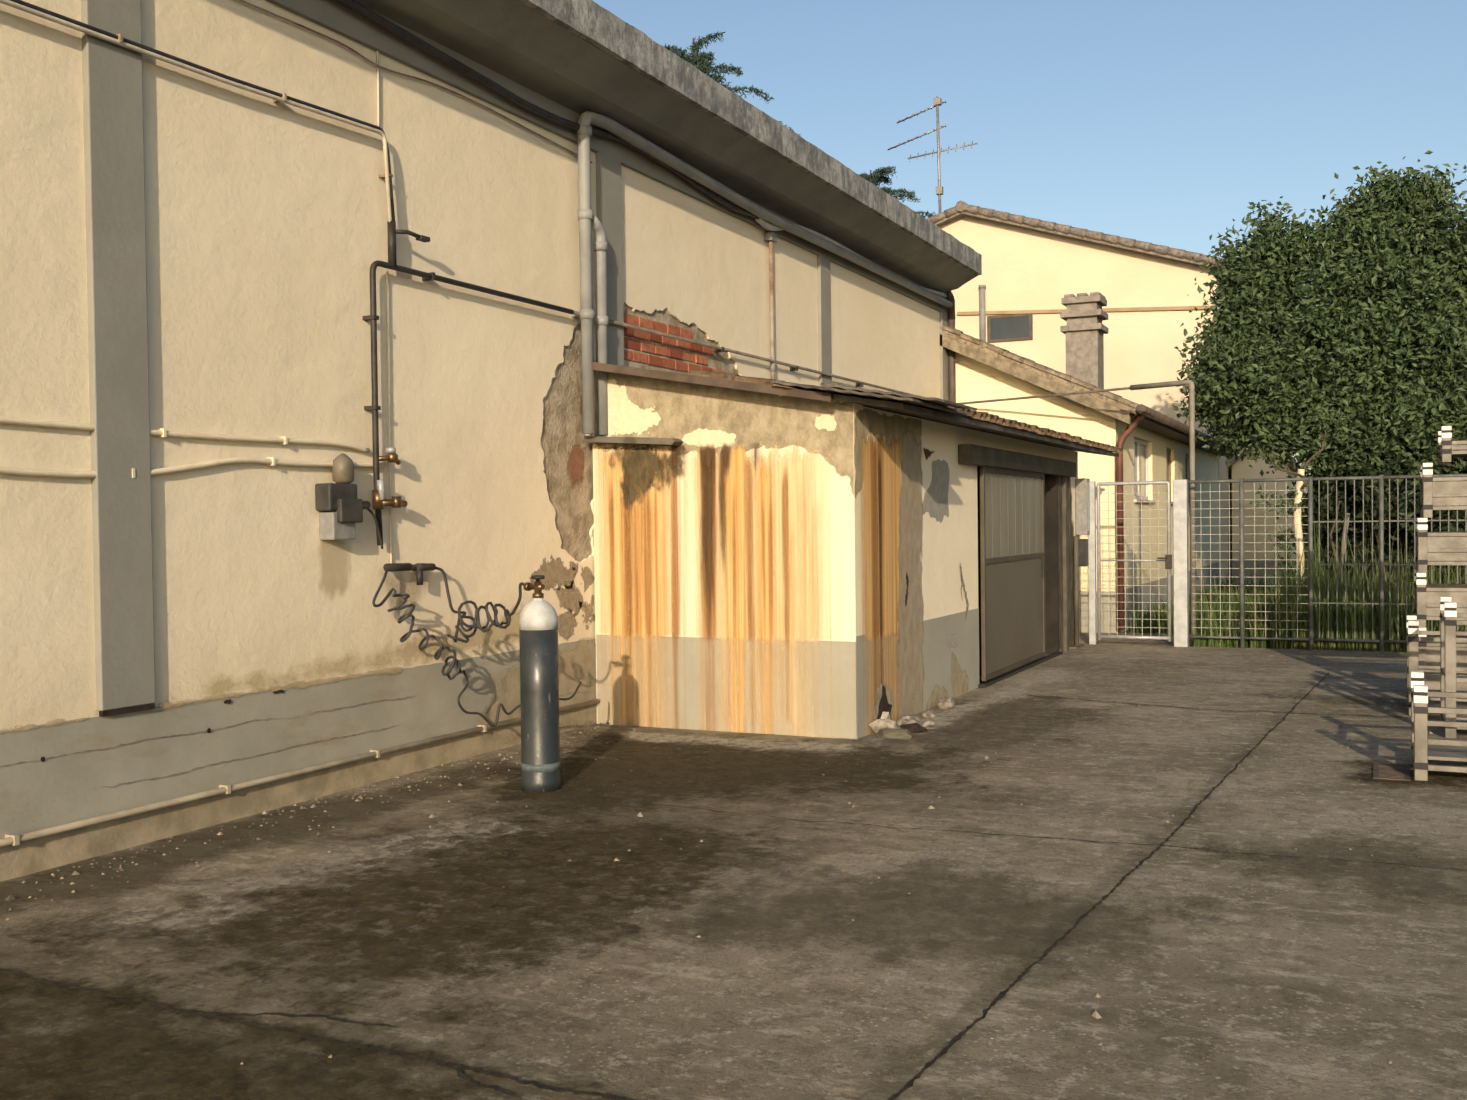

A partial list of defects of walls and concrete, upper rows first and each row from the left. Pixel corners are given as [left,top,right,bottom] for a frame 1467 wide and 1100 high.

crack [0,696,414,789]
peeling [477,667,521,744]
corrosion [601,445,678,725]
flaking render [530,304,969,728]
corrosion [695,444,818,733]
corrosion [863,436,902,732]
crack [0,969,627,1100]